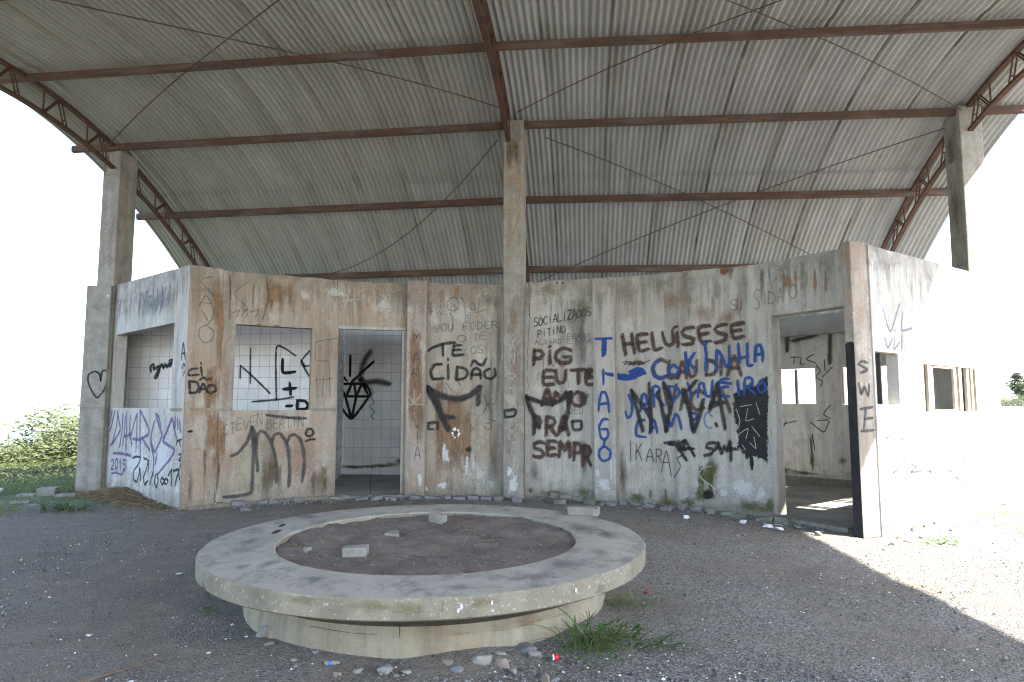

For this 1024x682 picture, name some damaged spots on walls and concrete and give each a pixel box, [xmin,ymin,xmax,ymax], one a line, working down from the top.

corrosion [213,288,224,365]
corrosion [205,375,225,467]
damp [649,462,716,506]